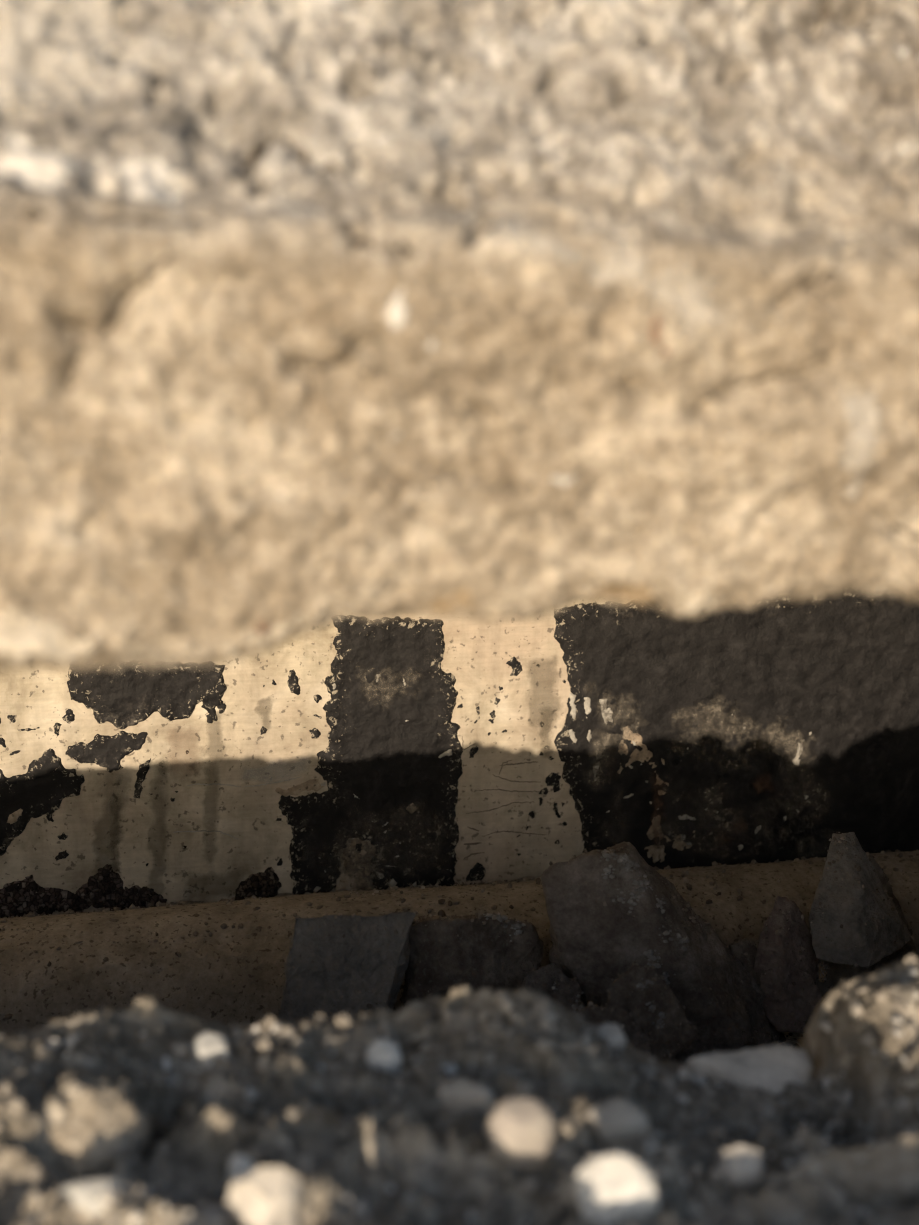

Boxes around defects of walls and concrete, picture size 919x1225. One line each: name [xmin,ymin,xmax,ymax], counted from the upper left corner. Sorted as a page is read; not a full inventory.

spalling [0,864,167,918]
peeling [0,663,227,861]
peeling [234,616,540,900]
peeling [516,583,919,870]